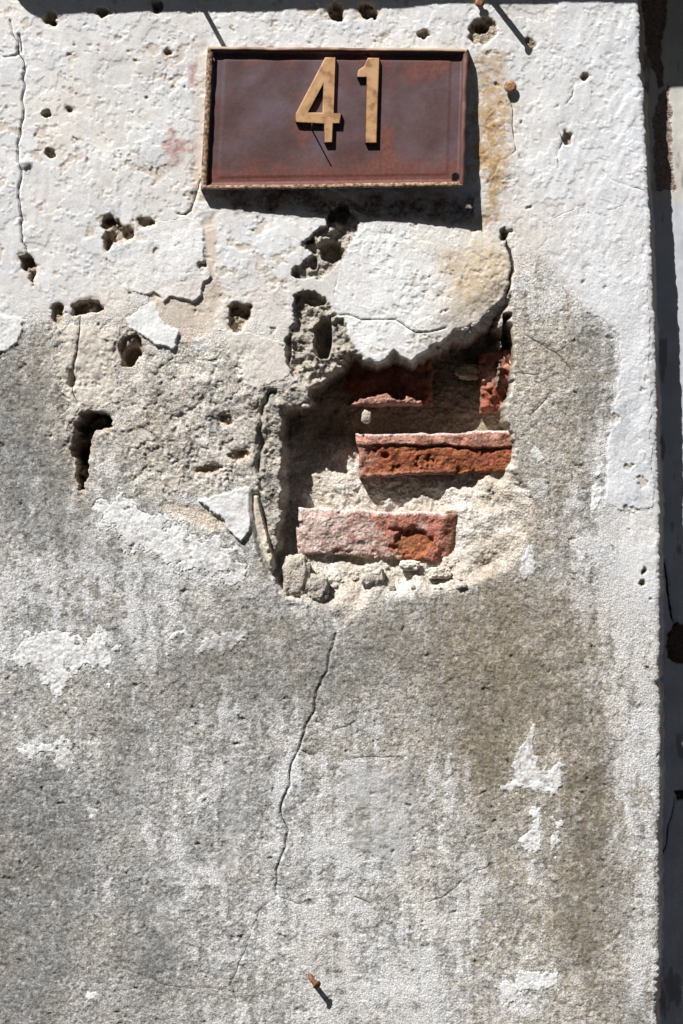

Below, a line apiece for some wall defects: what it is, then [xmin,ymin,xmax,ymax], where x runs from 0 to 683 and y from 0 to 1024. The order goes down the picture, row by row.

crack [4,25,28,253]
crack [72,316,81,399]
peeling [54,217,211,439]
spalling [92,292,536,626]
crack [152,638,335,1002]
peeling [500,722,567,798]
peeling [518,804,564,860]